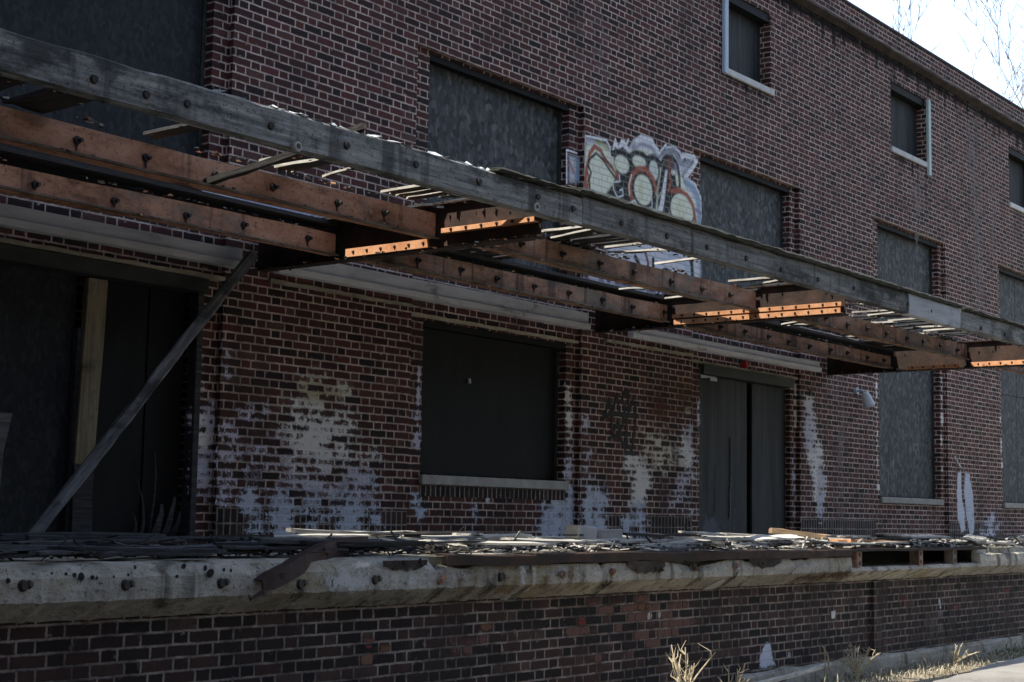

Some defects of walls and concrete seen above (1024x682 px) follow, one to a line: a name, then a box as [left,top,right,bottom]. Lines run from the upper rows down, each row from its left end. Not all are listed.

spalling [383,558,428,571]
spalling [628,560,666,574]